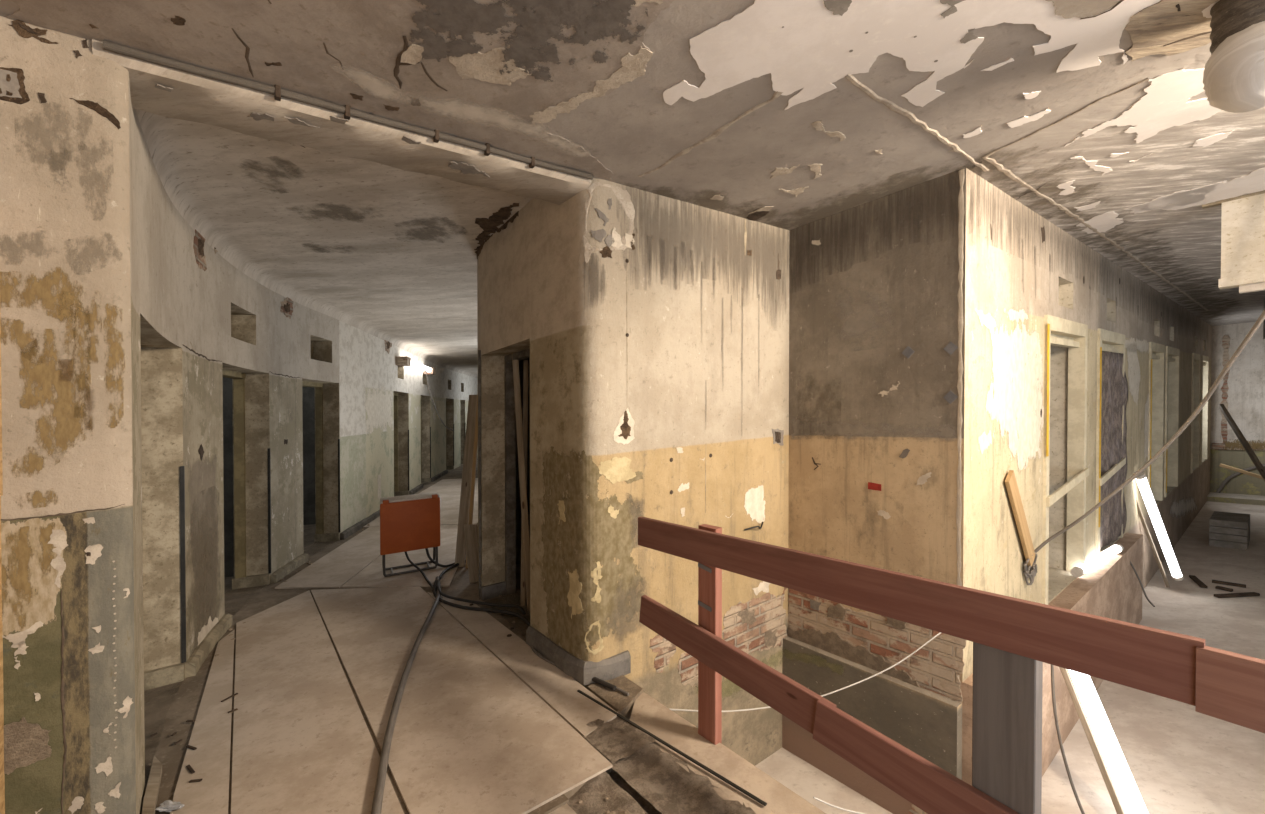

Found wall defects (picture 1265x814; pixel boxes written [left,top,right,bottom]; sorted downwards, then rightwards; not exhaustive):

crack [231,28,254,77]
crack [394,36,448,91]
peeling [663,0,1219,110]
damp [0,231,45,264]
damp [15,103,114,218]
damp [67,234,122,275]
damp [313,204,362,220]
peeling [6,0,674,263]
damp [640,198,784,310]
peeling [1064,68,1221,175]
peeling [542,408,644,661]
flaking render [722,581,967,703]